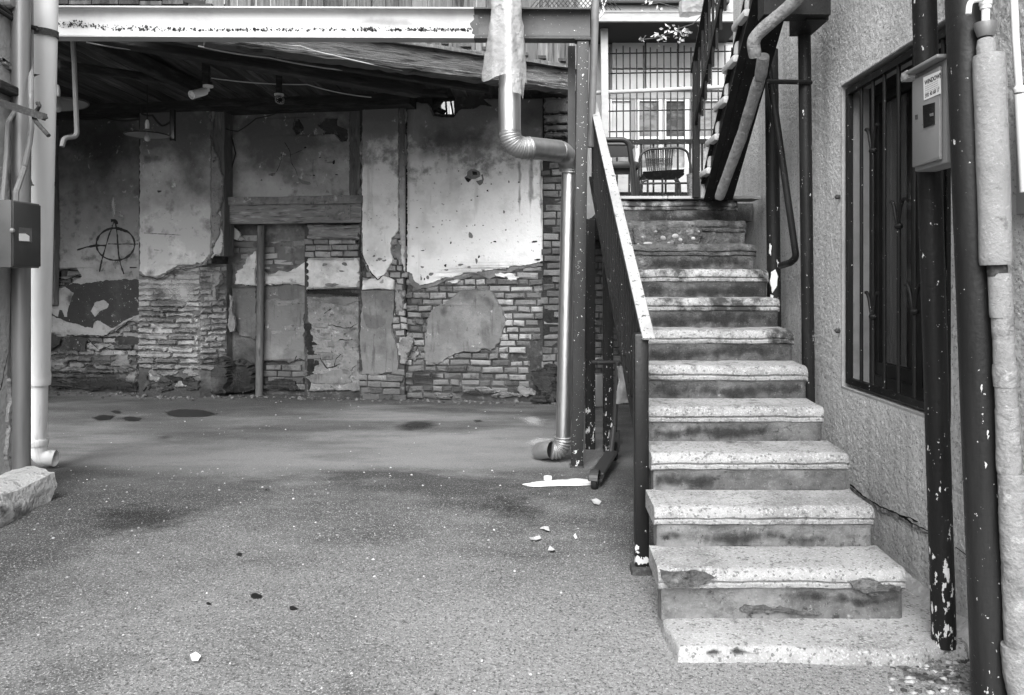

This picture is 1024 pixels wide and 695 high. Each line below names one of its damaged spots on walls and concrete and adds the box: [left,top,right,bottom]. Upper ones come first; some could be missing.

spalling [48,211,543,401]
crack [850,484,928,531]
spalling [739,604,822,615]